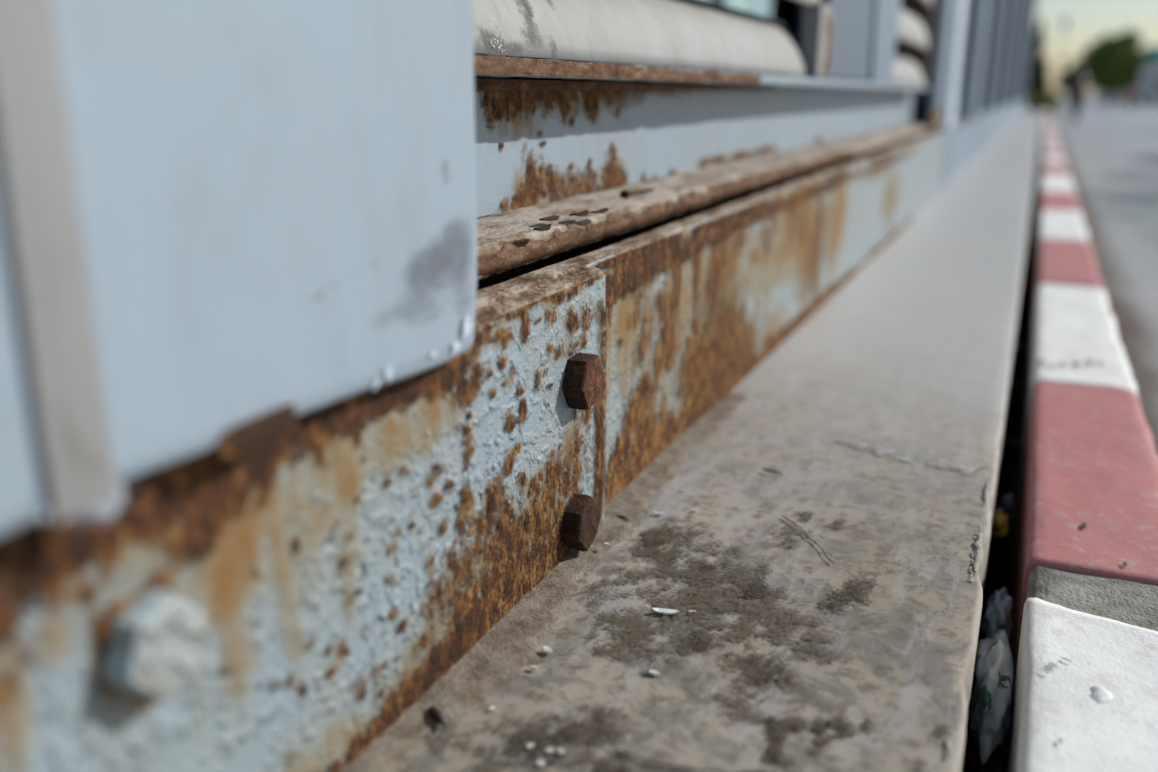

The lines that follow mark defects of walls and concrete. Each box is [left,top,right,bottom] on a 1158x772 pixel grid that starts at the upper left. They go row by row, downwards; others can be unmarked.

peeling [452,315,473,355]
corrosion [0,55,920,772]
water stain [488,710,614,769]
water stain [764,716,871,767]